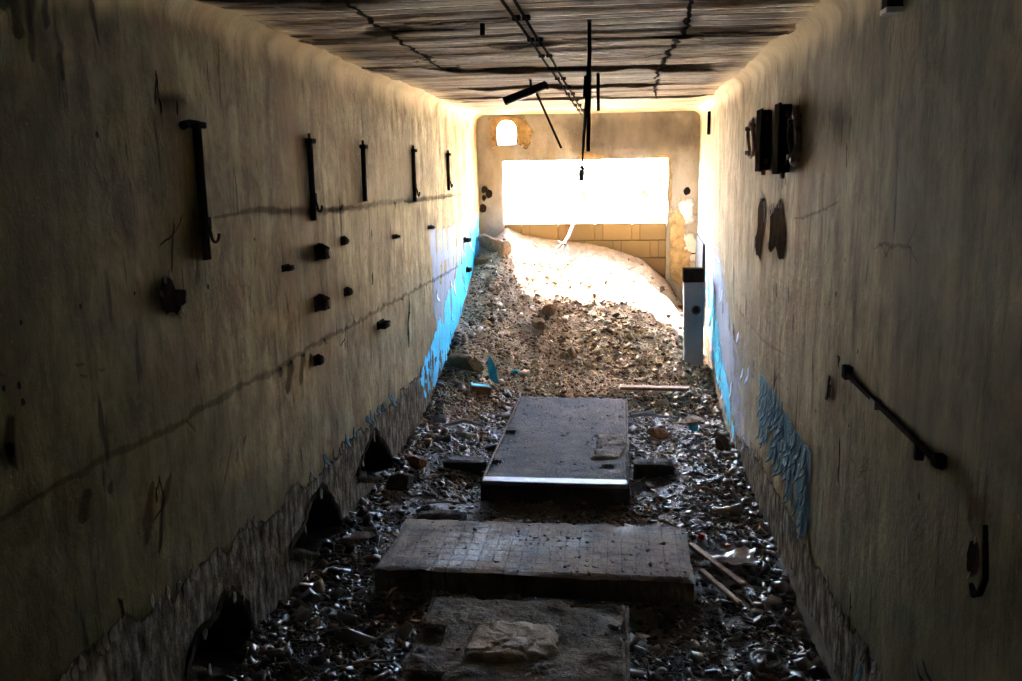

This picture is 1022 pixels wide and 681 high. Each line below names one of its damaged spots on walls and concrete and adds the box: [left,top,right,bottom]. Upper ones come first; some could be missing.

crack [221,0,794,100]
crack [154,475,165,557]
flaking render [59,186,492,681]
peeling [654,155,812,540]